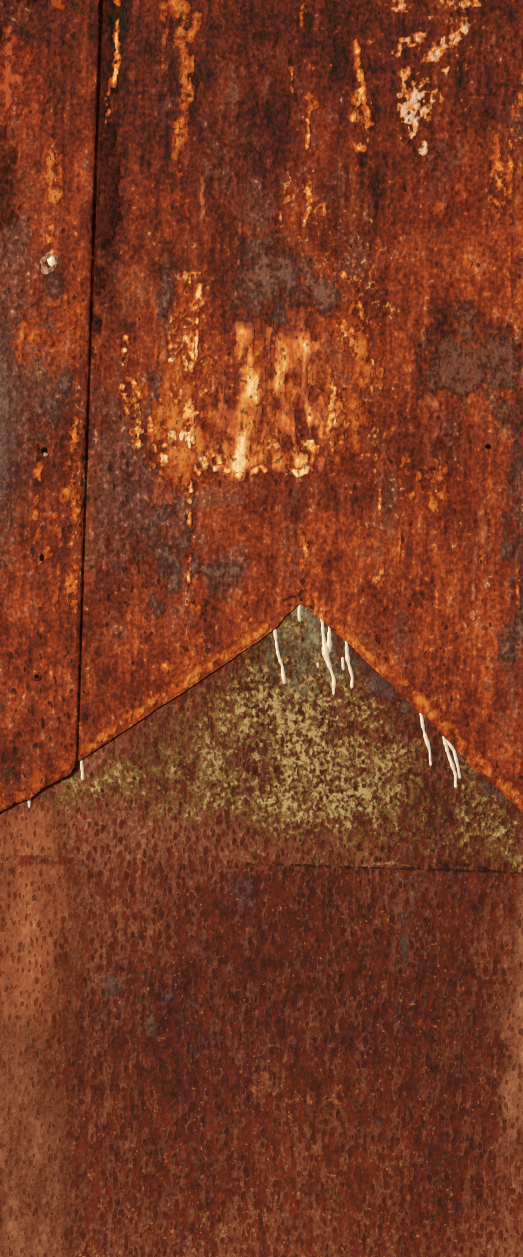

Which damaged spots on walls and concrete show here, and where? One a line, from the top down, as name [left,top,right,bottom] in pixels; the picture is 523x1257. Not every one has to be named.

corrosion [0,25,46,125]
corrosion [105,0,122,124]
corrosion [160,0,233,178]
corrosion [278,180,327,242]
corrosion [347,38,380,156]
corrosion [391,0,482,161]
corrosion [488,65,523,225]
water stain [0,355,15,496]
corrosion [119,260,386,509]
corrosion [31,415,82,614]
corrosion [372,456,450,613]
corrosion [281,528,523,812]